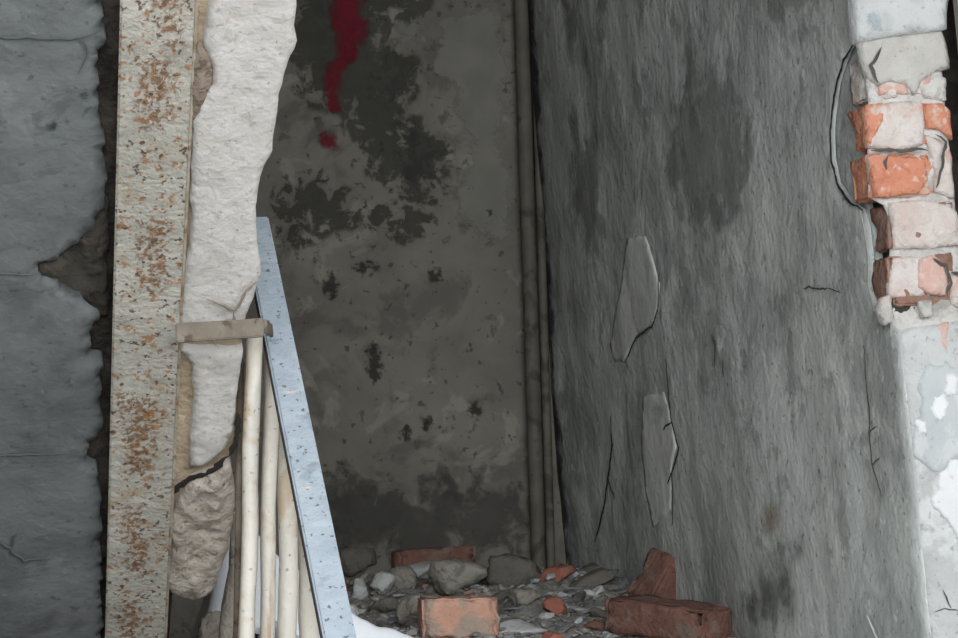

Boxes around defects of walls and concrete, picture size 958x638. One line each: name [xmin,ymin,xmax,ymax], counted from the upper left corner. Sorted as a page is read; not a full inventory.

crack [0,28,102,73]
corrosion [153,0,183,48]
corrosion [134,56,177,128]
spalling [38,185,110,317]
corrosion [137,218,169,292]
peeling [609,236,660,362]
spalling [847,31,958,543]
corrosion [118,393,158,474]
crack [662,359,679,524]
corrosion [120,506,147,576]
corrosion [117,605,145,638]